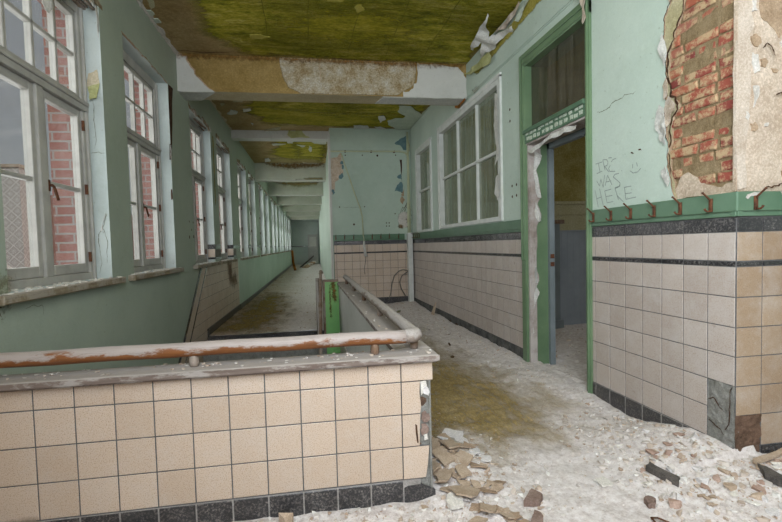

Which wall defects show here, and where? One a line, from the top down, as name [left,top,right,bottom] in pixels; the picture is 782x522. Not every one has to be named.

leakage [178,0,541,68]
leakage [244,101,430,128]
spalling [279,0,527,152]
spalling [655,0,782,199]
leakage [266,141,326,170]
leakage [277,178,322,186]
spalling [395,160,408,228]
peeling [525,105,583,337]
spalling [415,380,430,445]